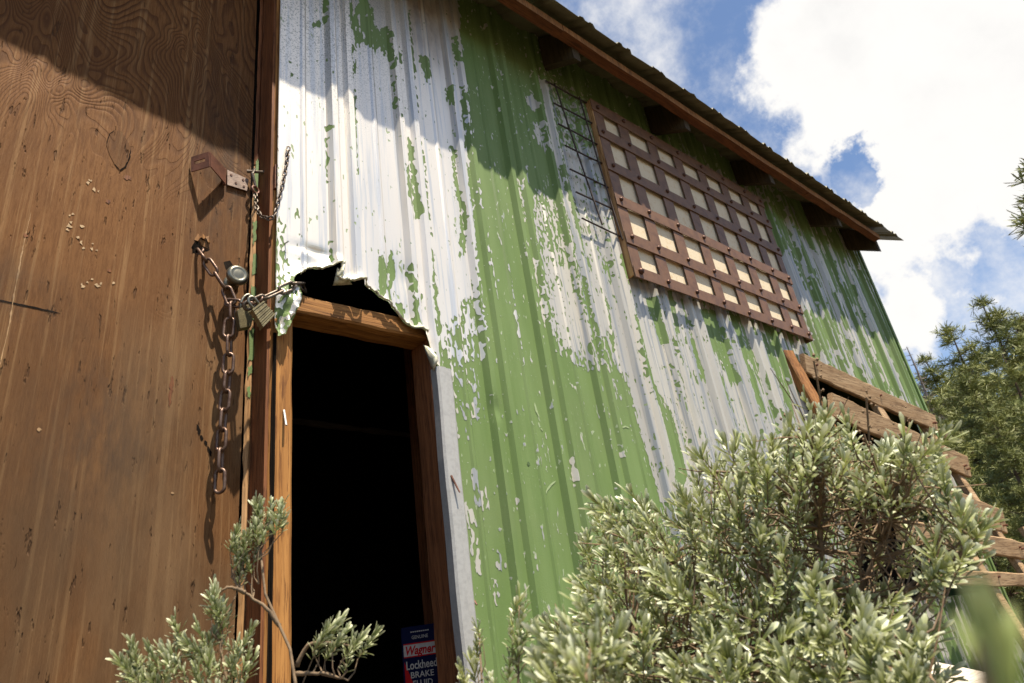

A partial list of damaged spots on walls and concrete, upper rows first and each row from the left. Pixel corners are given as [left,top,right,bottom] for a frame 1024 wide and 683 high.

peeling [274,0,920,645]
spalling [807,486,974,669]